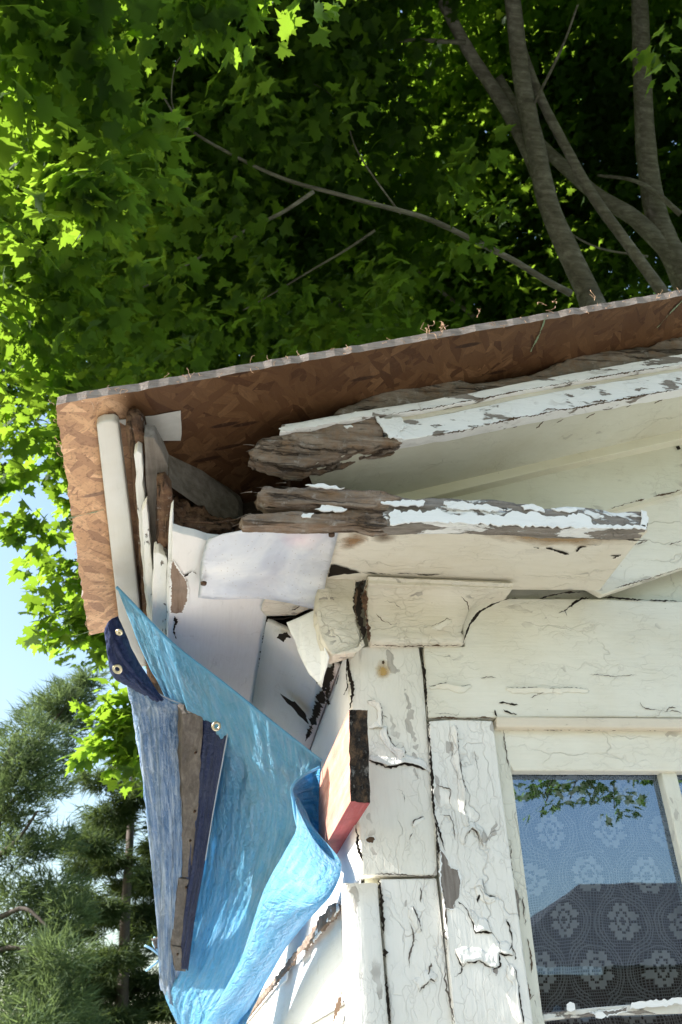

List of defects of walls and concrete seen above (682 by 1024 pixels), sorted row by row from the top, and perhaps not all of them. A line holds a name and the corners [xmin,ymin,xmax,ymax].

peeling [279,411,406,440]
peeling [301,505,347,518]
peeling [381,499,649,530]
crack [534,539,680,559]
peeling [169,560,189,614]
crack [512,568,682,615]
crack [305,572,632,1024]
peeling [278,904,339,989]